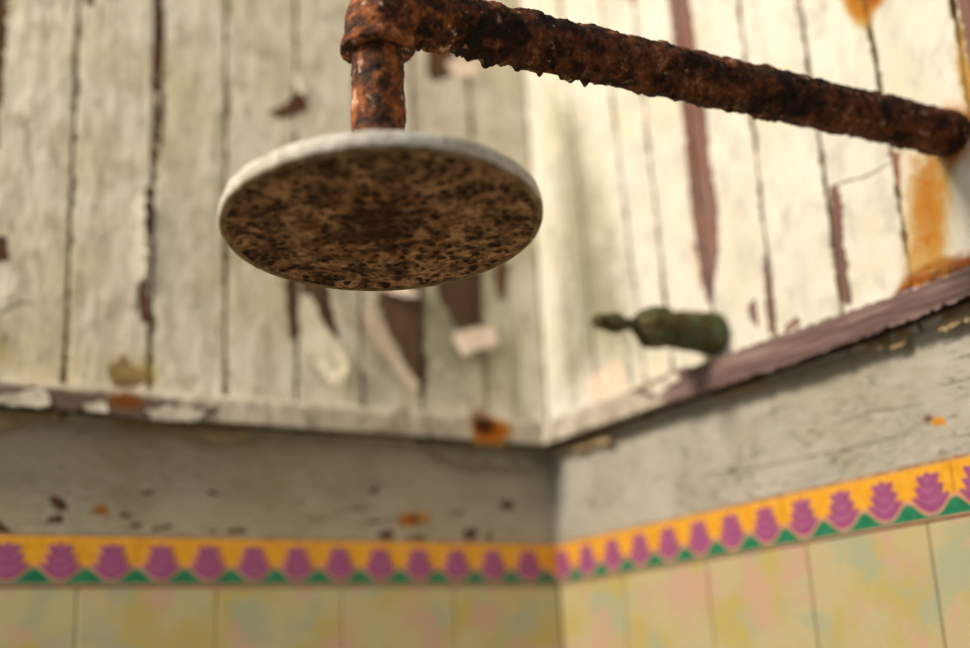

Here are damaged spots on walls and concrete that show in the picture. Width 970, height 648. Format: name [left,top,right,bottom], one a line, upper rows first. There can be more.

peeling [0,0,9,107]
peeling [667,0,697,50]
corrosion [843,0,881,26]
corrosion [951,23,970,120]
peeling [126,187,152,324]
peeling [274,276,350,392]
peeling [361,257,514,396]
peeling [680,101,720,307]
peeling [587,184,970,403]
corrosion [894,139,970,294]
peeling [0,354,252,442]
corrosion [470,410,510,444]